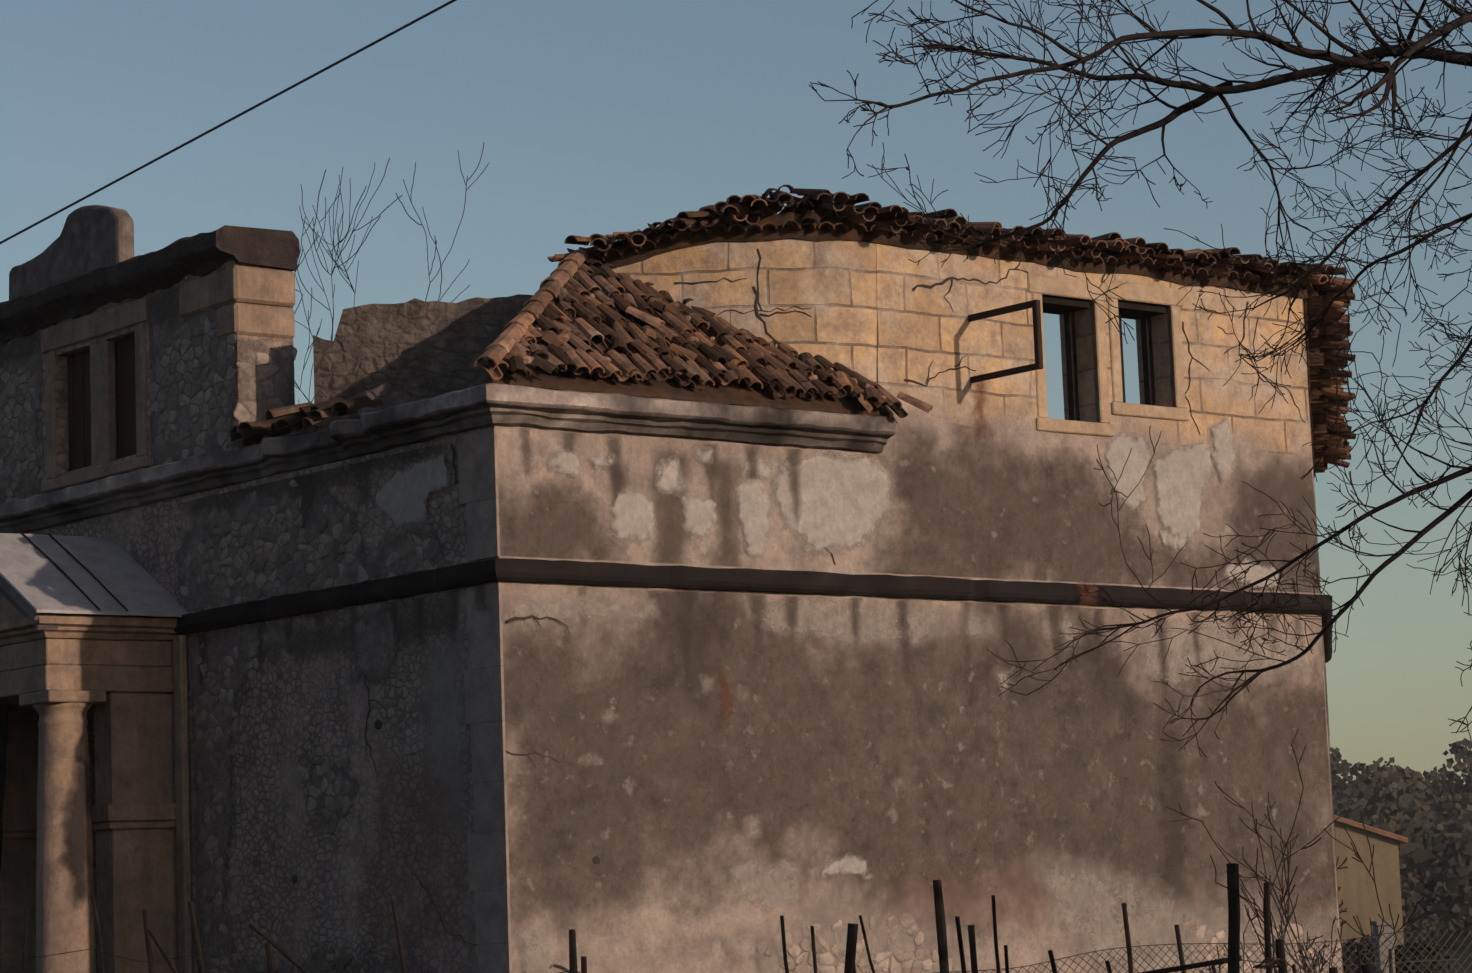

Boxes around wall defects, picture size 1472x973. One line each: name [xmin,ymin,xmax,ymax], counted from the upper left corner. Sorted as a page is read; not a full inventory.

flaking render [376,454,448,528]
water stain [499,489,609,560]
flaking render [549,452,613,476]
flaking render [611,459,717,544]
water stain [658,457,686,563]
flaking render [697,449,713,462]
water stain [707,447,737,566]
flaking render [737,452,892,557]
water stain [885,361,1321,594]
flaking render [1224,559,1279,588]
water stain [504,590,1340,927]
water stain [63,762,89,899]